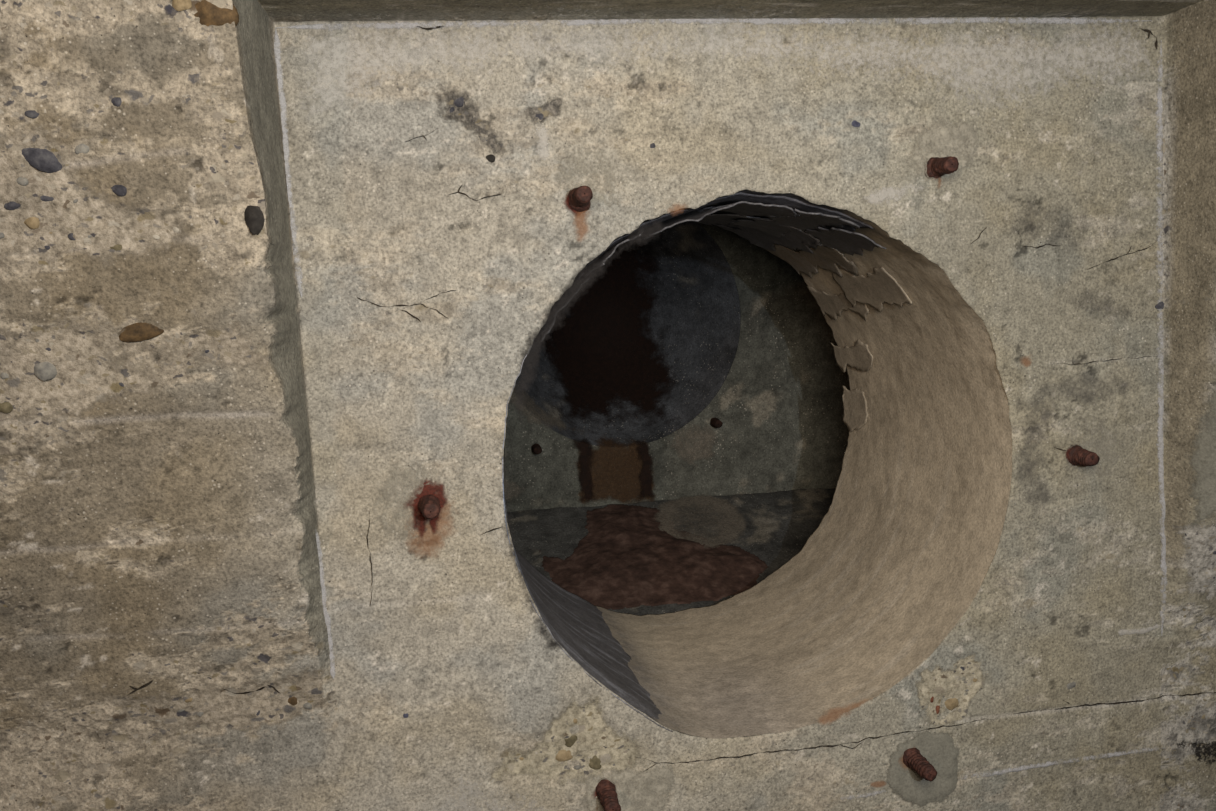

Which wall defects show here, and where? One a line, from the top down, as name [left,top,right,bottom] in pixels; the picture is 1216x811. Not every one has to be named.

rust [924,157,943,179]
rust [565,187,591,216]
rust [1066,444,1082,466]
rust [408,481,447,536]
crack [637,692,1216,773]
rust [903,748,920,768]
rust [595,778,616,800]